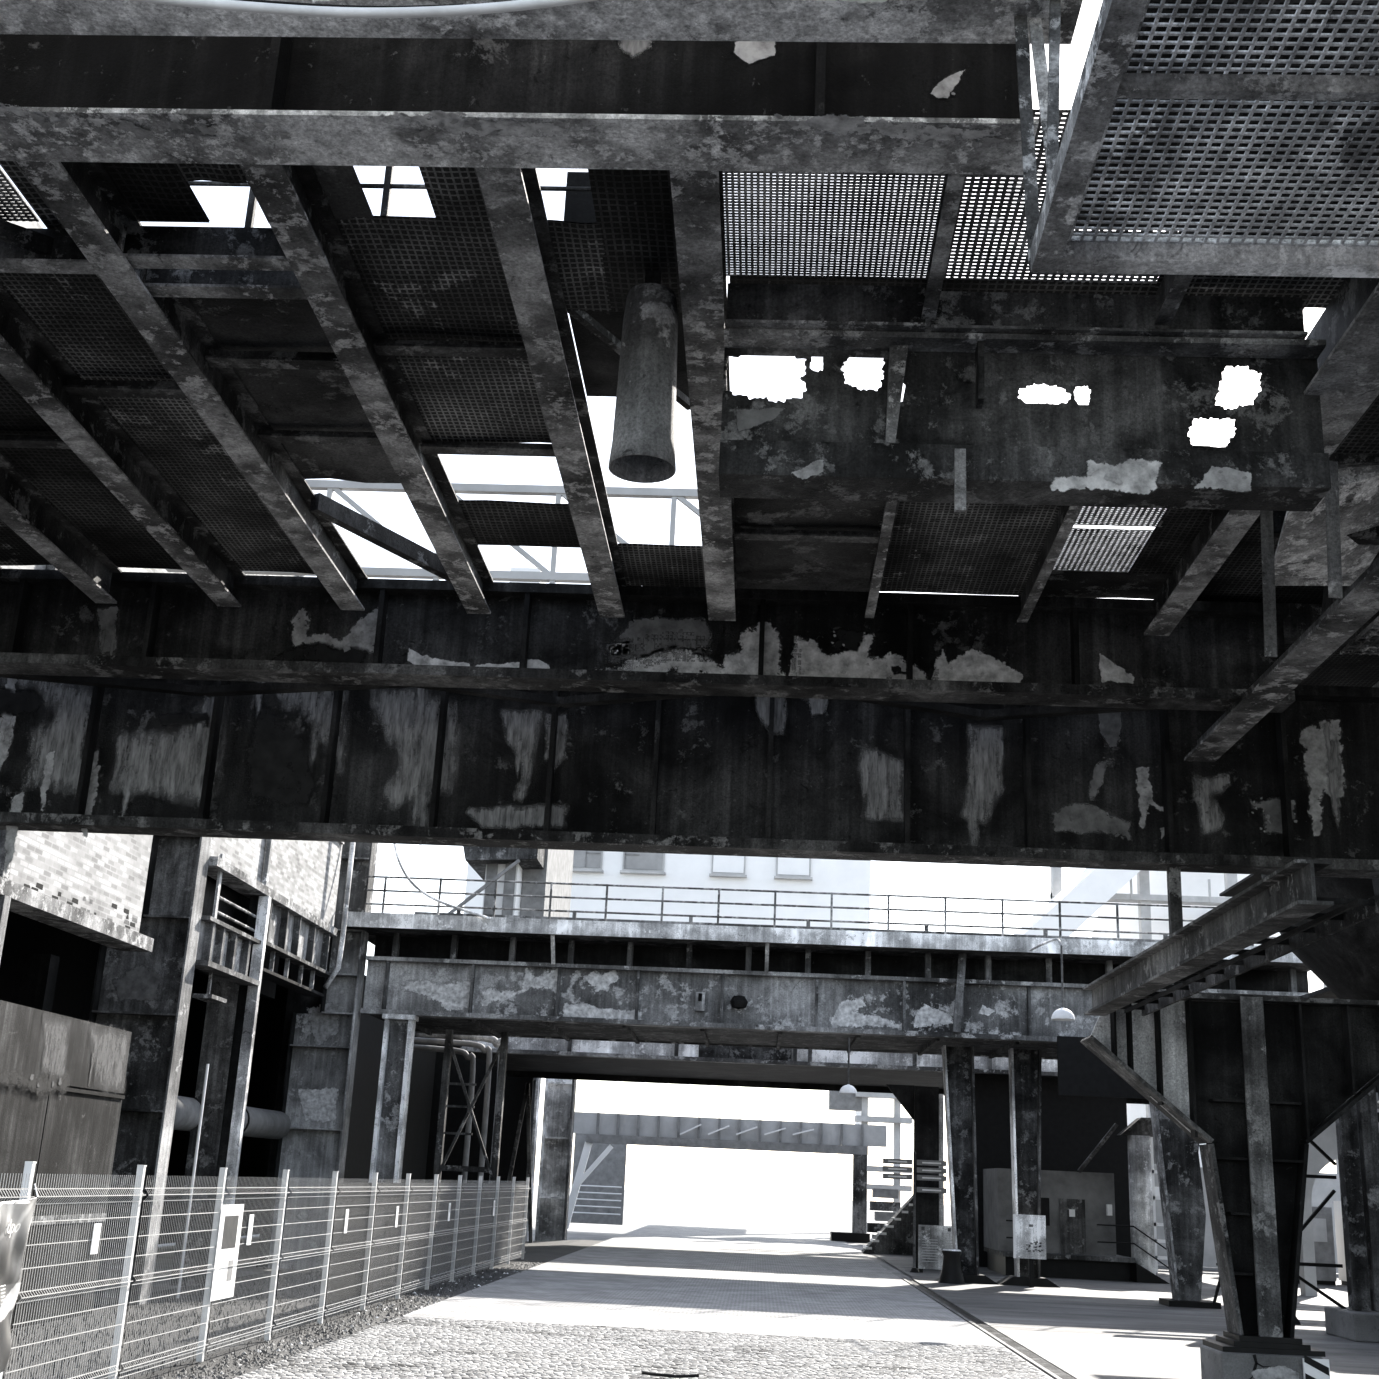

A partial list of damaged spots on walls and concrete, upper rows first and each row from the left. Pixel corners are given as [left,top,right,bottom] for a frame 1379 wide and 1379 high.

peeling [291,607,387,653]
peeling [607,616,713,664]
peeling [544,713,567,767]
peeling [373,688,459,845]
peeling [396,968,642,1020]